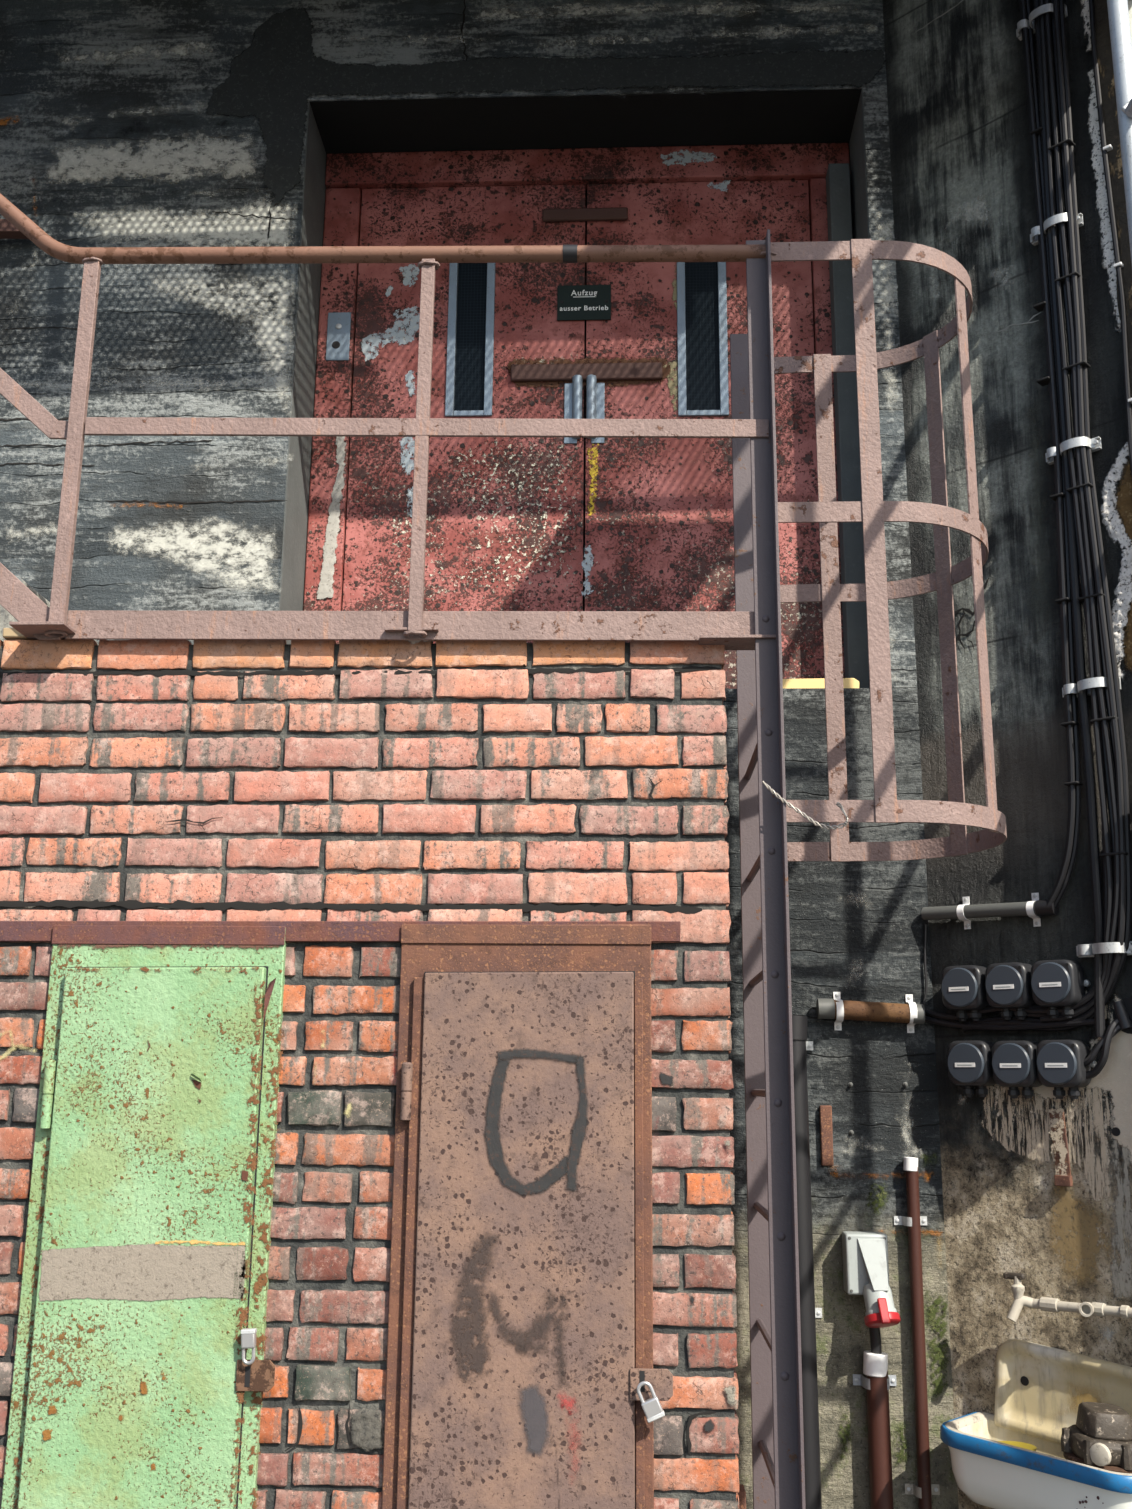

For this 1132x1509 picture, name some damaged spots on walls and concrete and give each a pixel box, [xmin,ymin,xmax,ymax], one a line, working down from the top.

peeling [361,264,420,361]
peeling [405,370,415,396]
water stain [1101,442,1132,678]
corrosion [58,944,285,1371]
water stain [985,1086,1106,1141]
water stain [1050,1186,1111,1282]
corrosion [11,1137,50,1509]
corrosion [42,1405,57,1441]
corrosion [228,1391,263,1509]